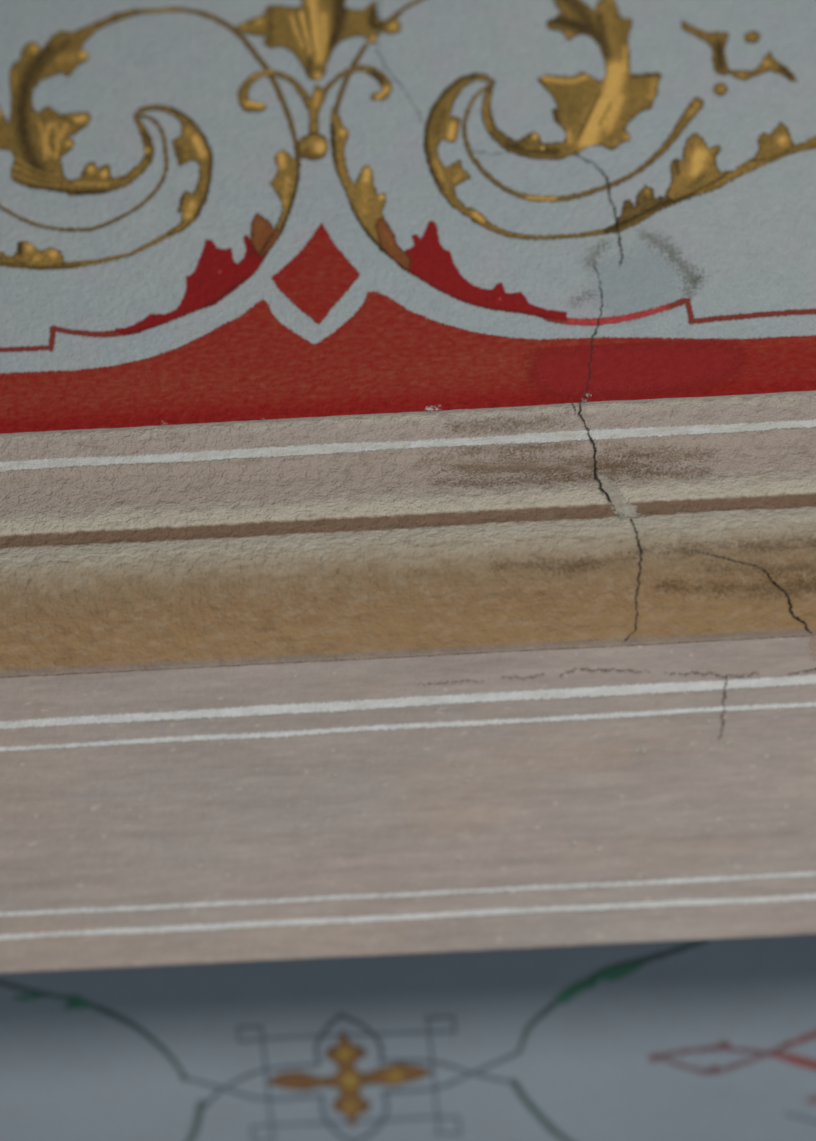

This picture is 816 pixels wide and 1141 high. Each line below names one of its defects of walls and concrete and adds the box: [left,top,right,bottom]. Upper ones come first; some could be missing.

crack [572,153,642,641]
crack [692,550,812,634]
crack [670,671,758,739]